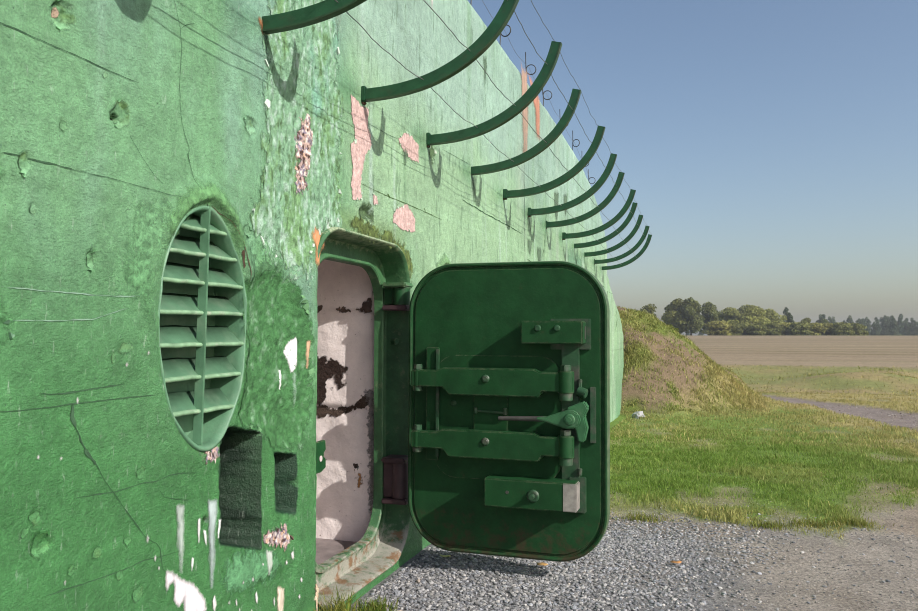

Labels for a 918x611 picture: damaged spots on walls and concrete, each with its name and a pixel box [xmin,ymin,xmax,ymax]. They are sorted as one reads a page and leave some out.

spalling [267,0,324,15]
corrosion [521,65,533,96]
crack [0,1,252,280]
peeling [399,131,437,164]
corrosion [522,96,540,152]
spalling [233,18,378,451]
peeling [393,204,415,232]
crack [1,384,197,597]
spalling [263,524,294,550]